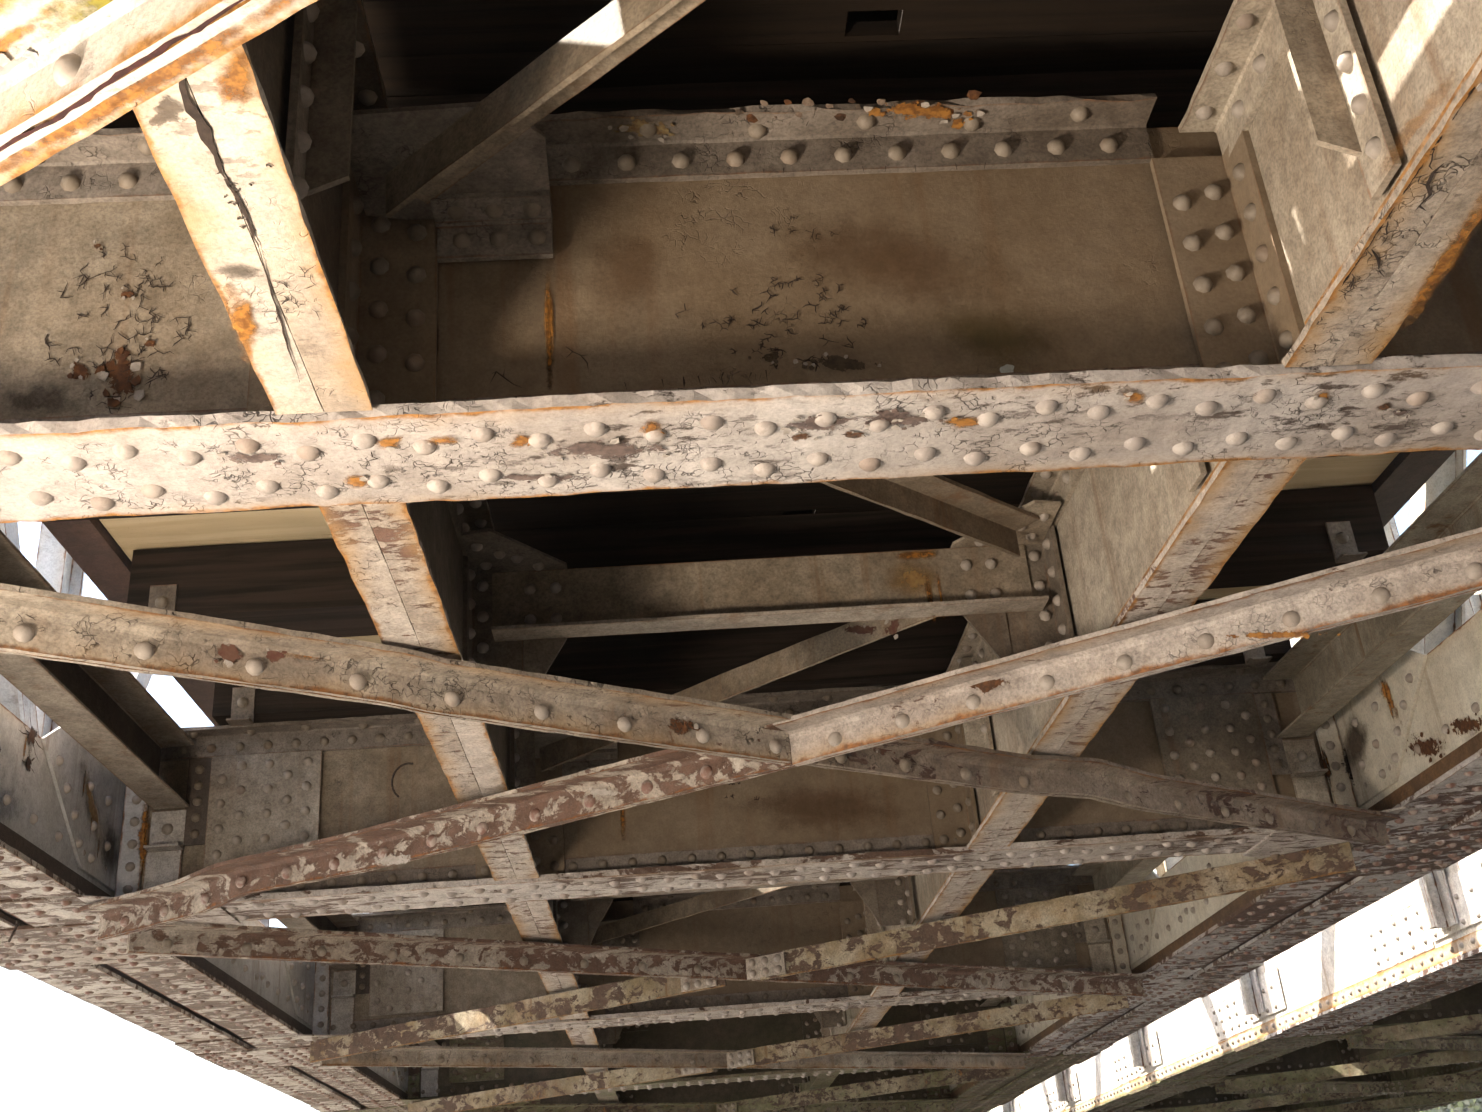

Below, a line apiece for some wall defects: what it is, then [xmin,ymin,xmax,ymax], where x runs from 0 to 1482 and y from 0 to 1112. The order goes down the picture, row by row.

rust [0,0,292,173]
rust [735,90,985,129]
crack [0,243,198,477]
crack [259,250,319,382]
crack [661,216,868,387]
crack [1317,87,1475,325]
rust [1409,199,1482,314]
peeling [502,438,670,484]
peeling [781,409,951,435]
rust [1381,681,1398,717]
rust [1406,713,1482,763]
peeling [371,853,411,866]